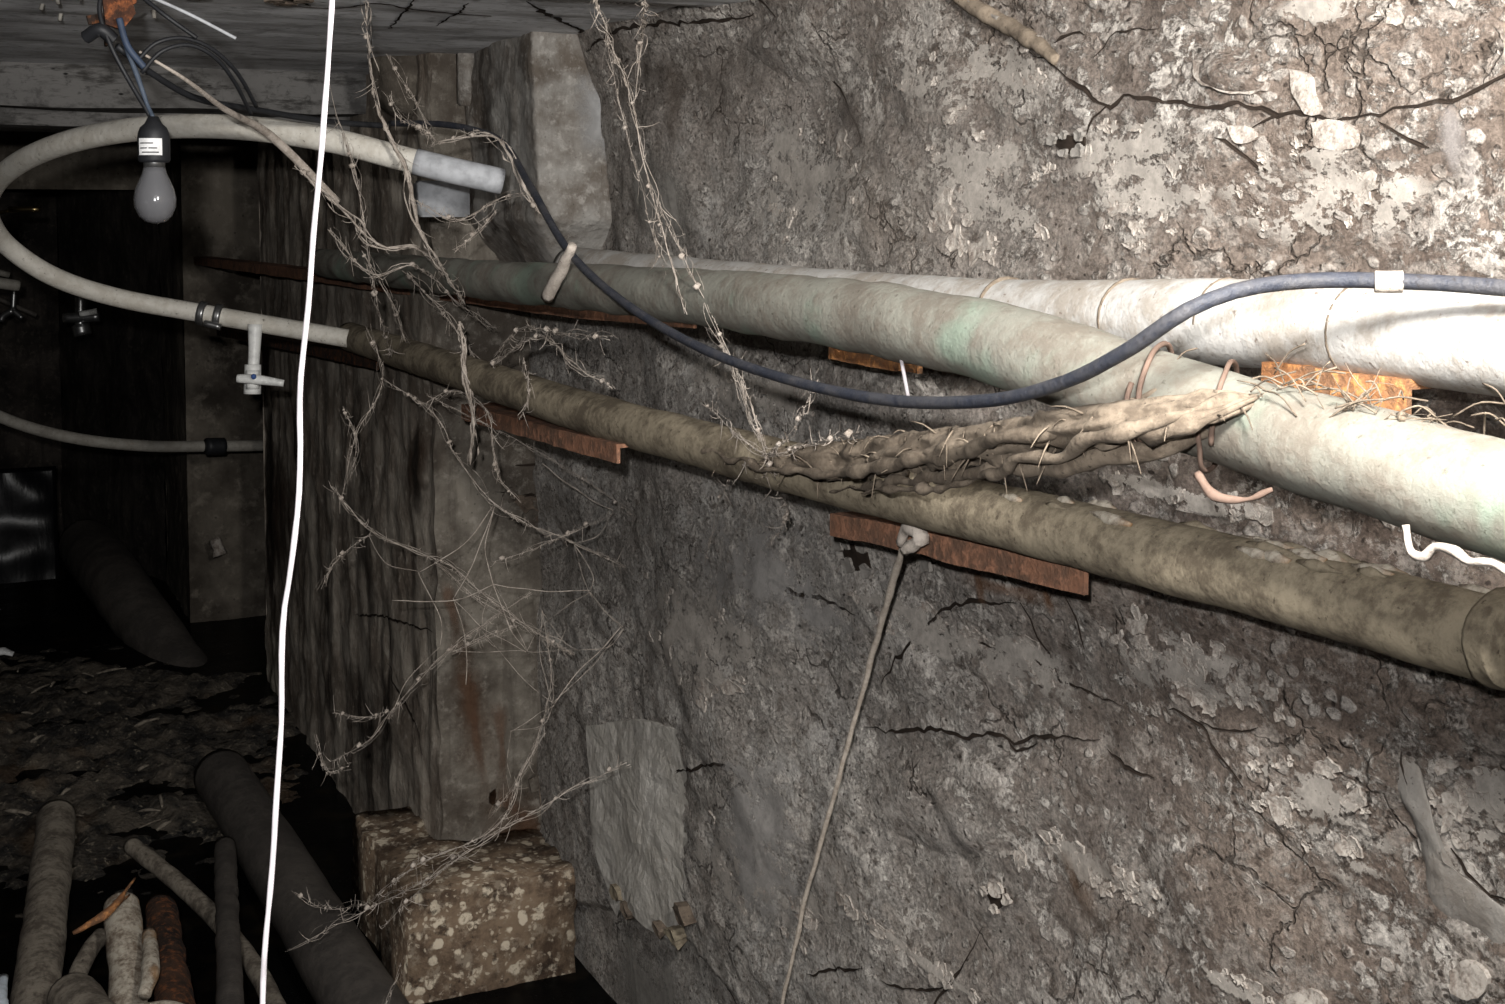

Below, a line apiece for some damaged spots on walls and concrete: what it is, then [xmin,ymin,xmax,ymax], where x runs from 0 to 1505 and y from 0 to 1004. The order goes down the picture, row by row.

crack [279,0,486,28]
crack [526,0,776,52]
crack [832,81,862,143]
crack [1029,28,1505,171]
crack [783,587,854,615]
crack [881,596,1121,706]
crack [871,725,1154,778]
crack [1169,708,1258,787]
crack [808,927,983,1004]